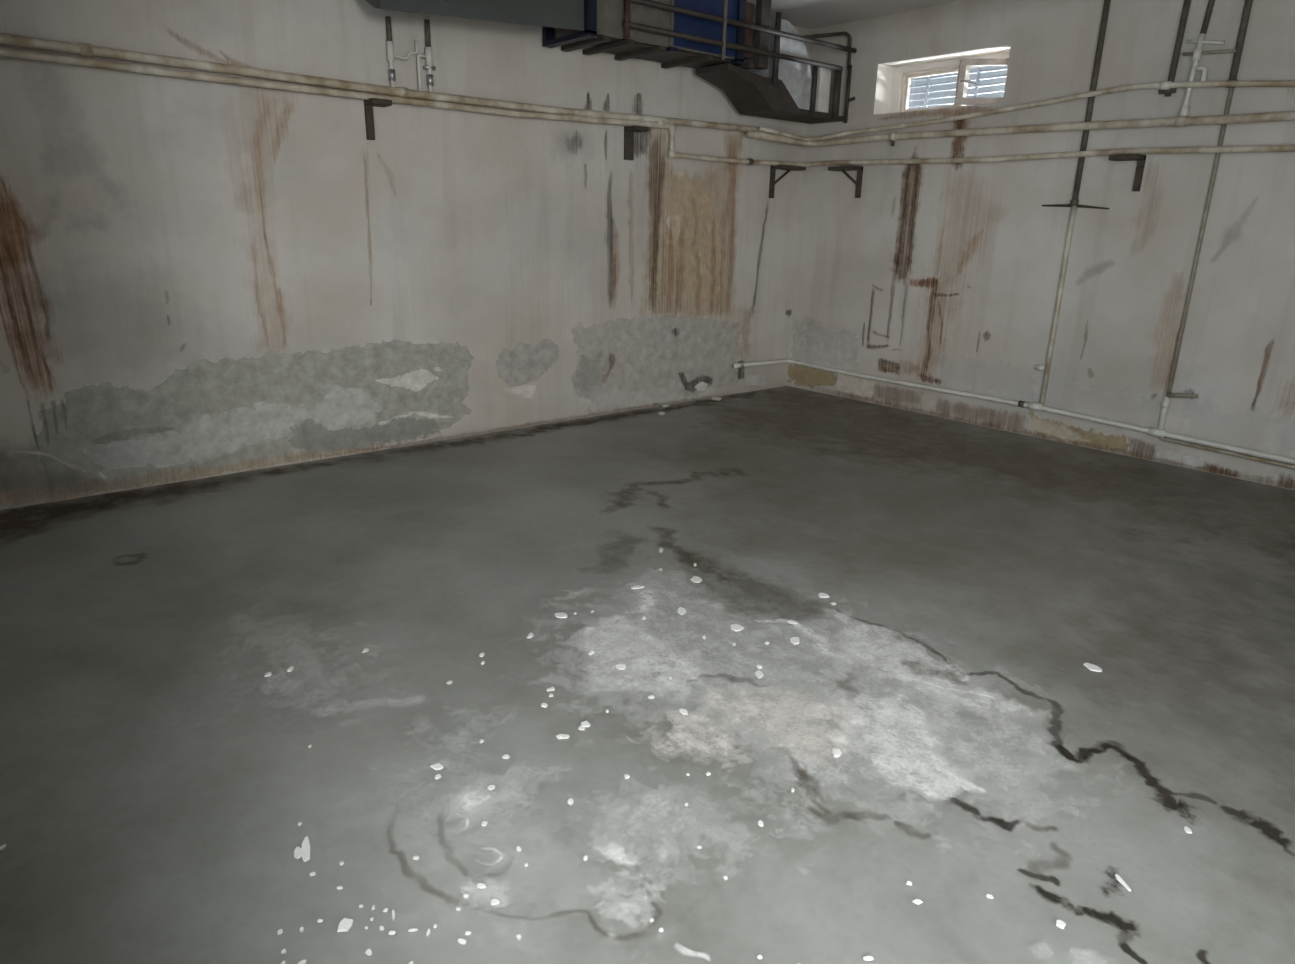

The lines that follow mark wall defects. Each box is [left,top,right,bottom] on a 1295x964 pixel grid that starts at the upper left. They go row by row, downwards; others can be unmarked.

rust [0,179,67,445]
peeling [36,339,474,493]
peeling [496,315,767,413]
rust [634,127,744,318]
rust [887,153,970,384]
crack [780,748,930,839]
crack [835,609,1295,857]
crack [943,797,1148,964]
crack [1196,949,1210,964]